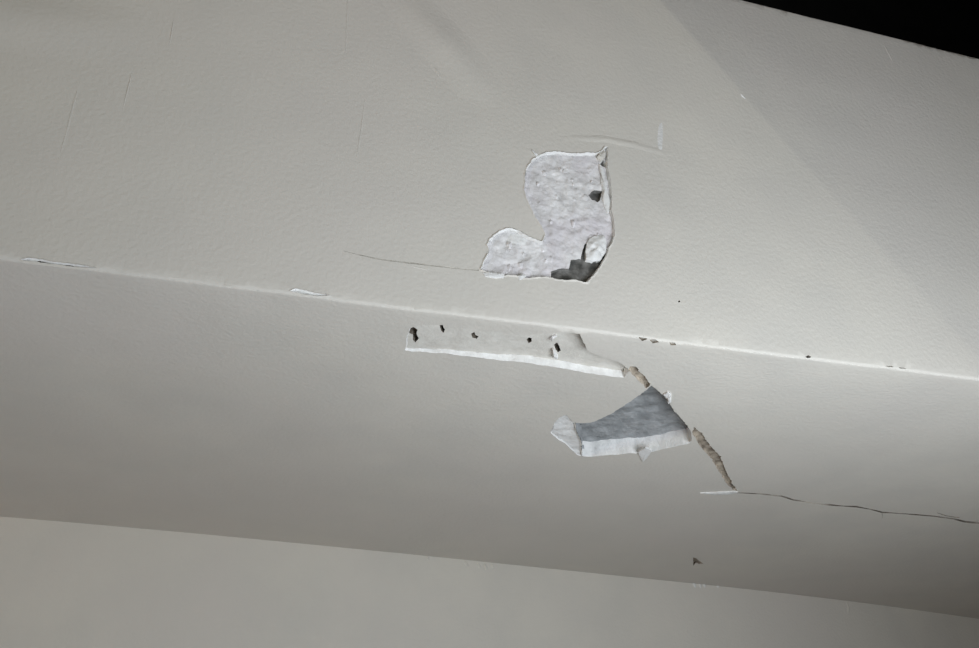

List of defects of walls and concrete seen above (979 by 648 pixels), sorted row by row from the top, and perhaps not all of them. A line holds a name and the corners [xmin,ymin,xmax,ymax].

spalling [479,146,616,284]
spalling [405,325,630,378]
crack [628,366,650,388]
spalling [551,386,692,462]
crack [692,427,979,524]